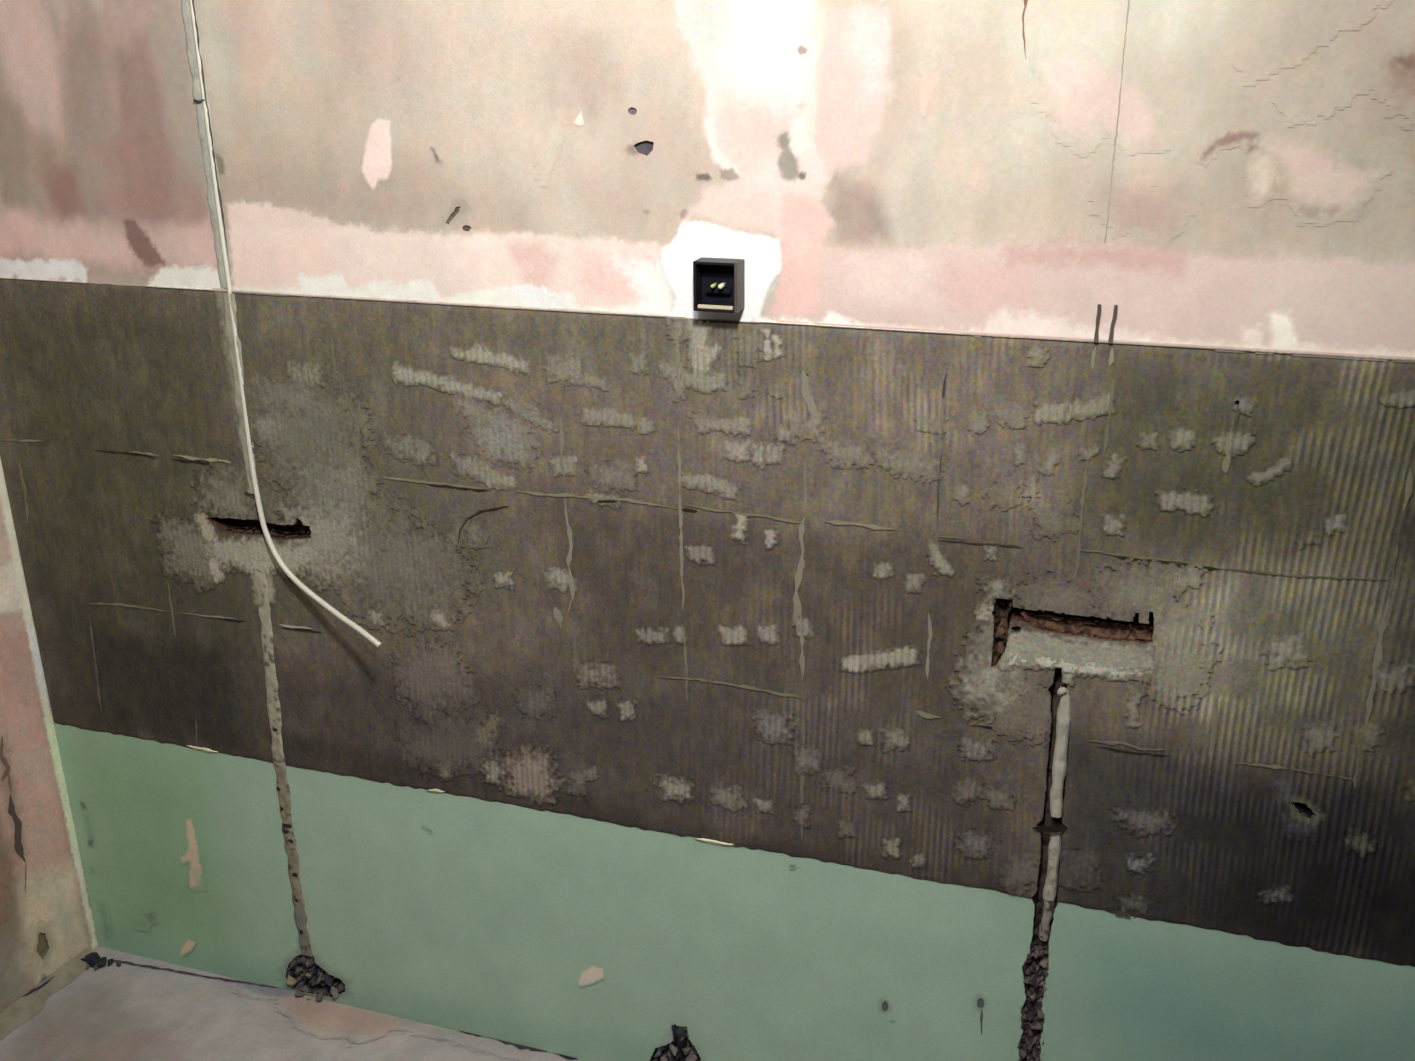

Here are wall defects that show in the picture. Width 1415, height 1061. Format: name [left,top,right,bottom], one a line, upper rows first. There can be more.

crack [0,729,35,892]
peeling [179,816,207,894]